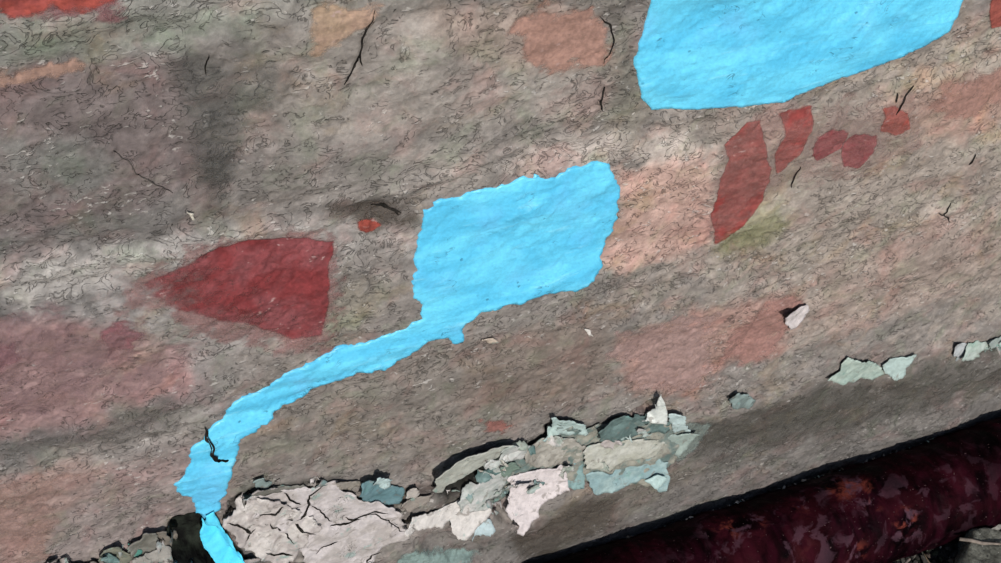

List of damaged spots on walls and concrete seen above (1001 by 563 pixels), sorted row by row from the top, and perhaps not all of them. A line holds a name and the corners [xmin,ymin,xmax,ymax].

crack [344,11,375,85]
crack [602,18,615,62]
peeling [828,354,916,385]
peeling [953,336,1001,362]
peeling [90,395,699,563]